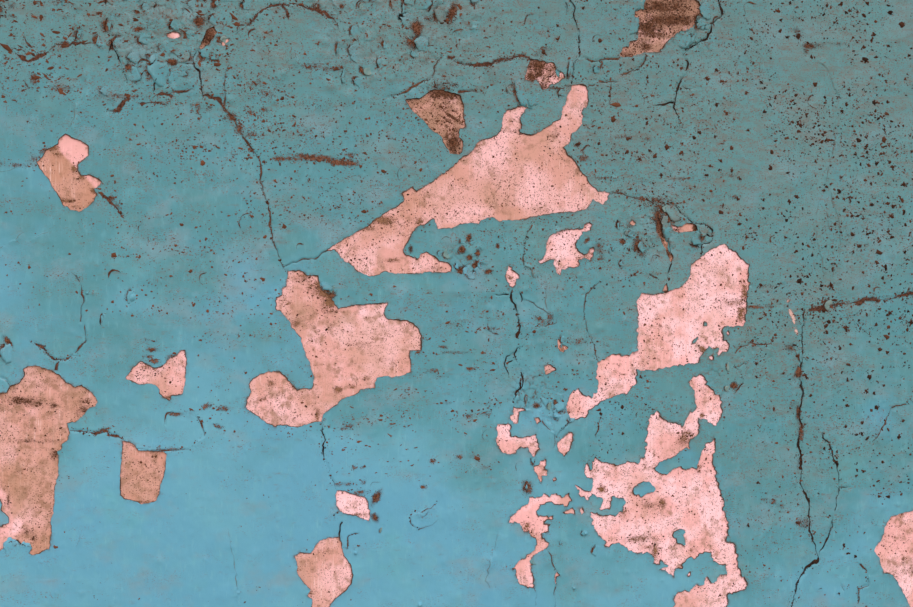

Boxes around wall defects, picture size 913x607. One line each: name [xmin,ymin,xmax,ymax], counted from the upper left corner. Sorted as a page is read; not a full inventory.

crack [565,0,646,103]
peeling [37,134,102,212]
crack [12,27,330,272]
peeling [327,59,610,280]
peeling [0,365,98,555]
peeling [120,440,167,504]
peeling [126,350,187,401]
peeling [246,270,422,428]
peeling [496,220,751,607]
crack [733,287,913,607]
peeling [295,537,353,607]
peeling [874,511,913,607]